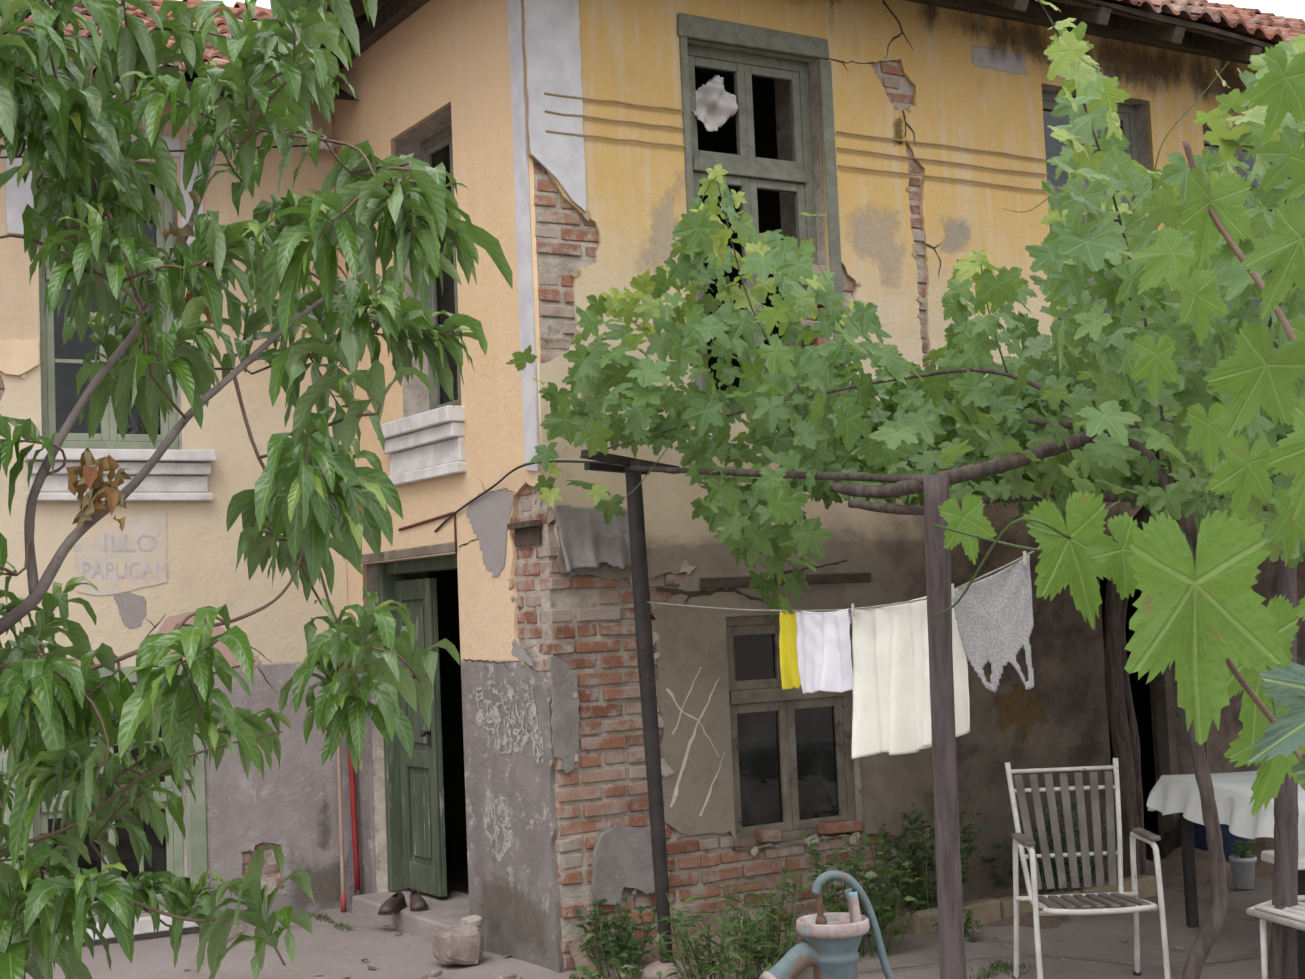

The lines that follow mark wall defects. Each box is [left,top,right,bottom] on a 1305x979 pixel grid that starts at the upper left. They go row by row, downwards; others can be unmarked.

crack [829,0,913,72]
crack [902,110,916,144]
spalling [533,158,599,363]
crack [922,242,942,274]
spalling [466,484,917,972]